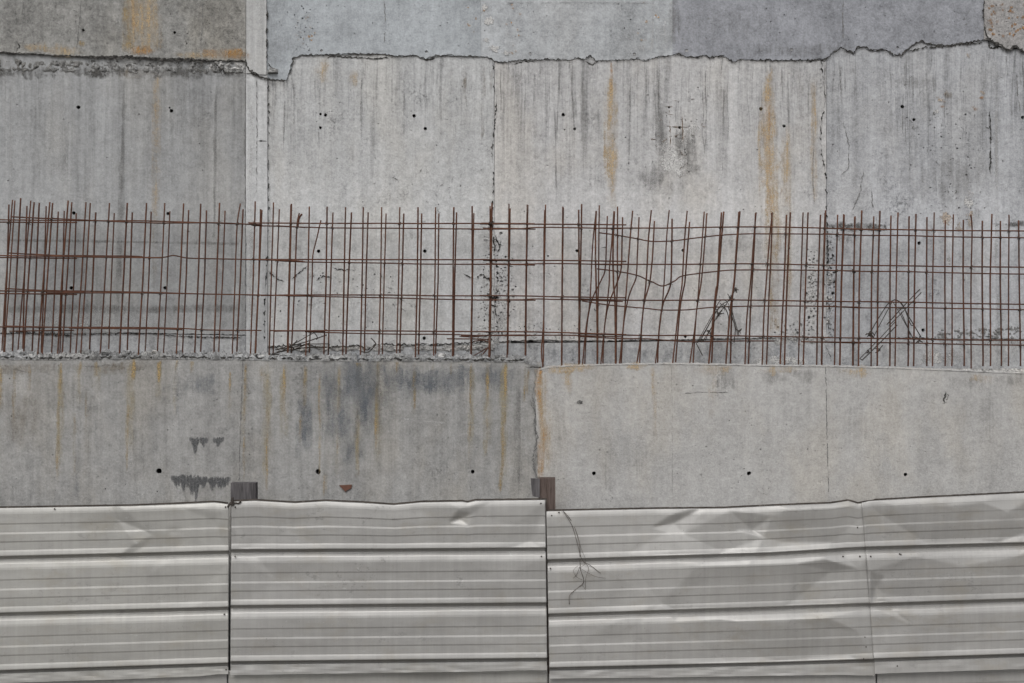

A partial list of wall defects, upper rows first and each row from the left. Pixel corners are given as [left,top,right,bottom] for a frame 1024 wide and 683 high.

crack [0,1,1024,492]
spalling [0,191,1024,373]